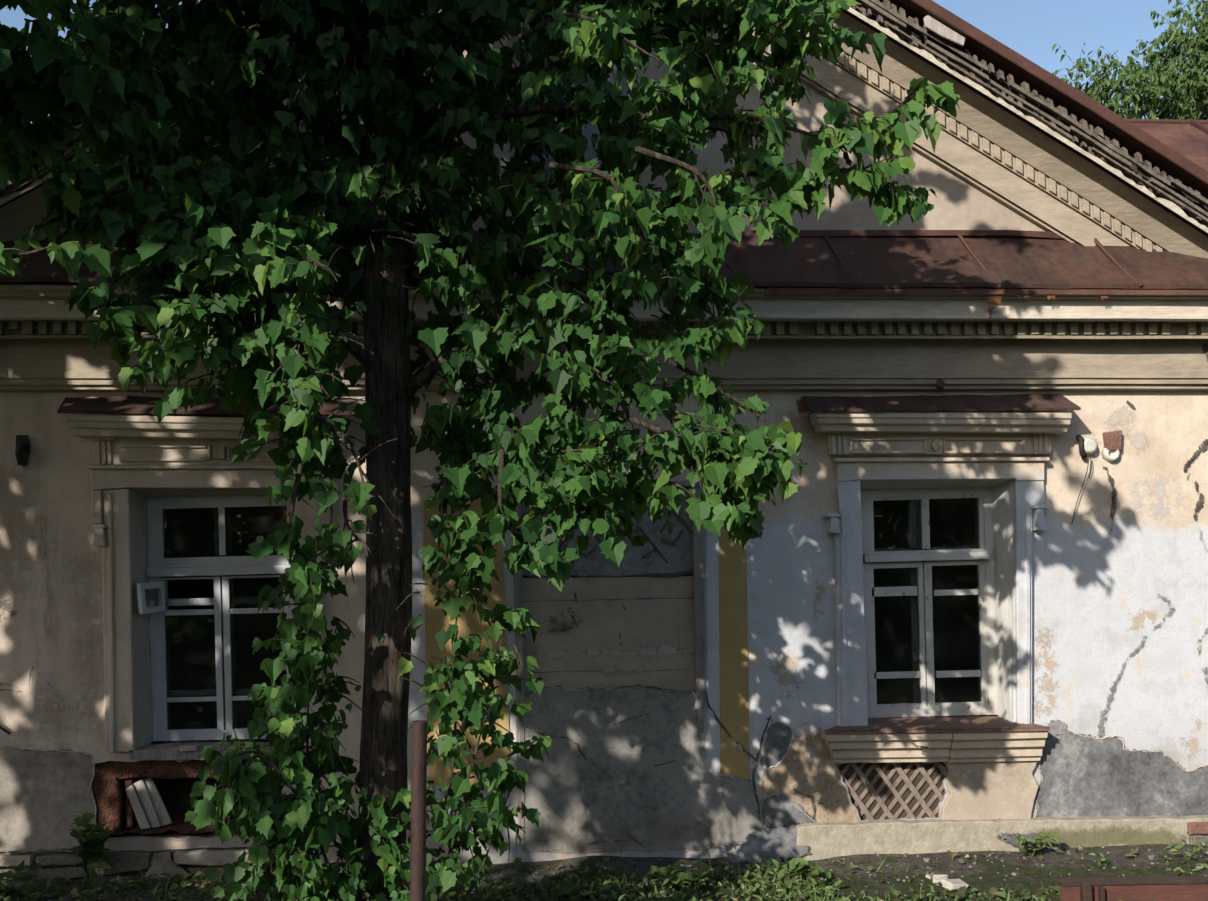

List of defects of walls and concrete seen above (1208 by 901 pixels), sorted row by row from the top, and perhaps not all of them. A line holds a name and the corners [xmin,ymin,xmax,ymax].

crack [1200,343,1208,360]
crack [1103,466,1117,531]
crack [1183,439,1208,543]
crack [1097,595,1175,737]
crack [1197,628,1208,683]
spalling [760,723,950,822]